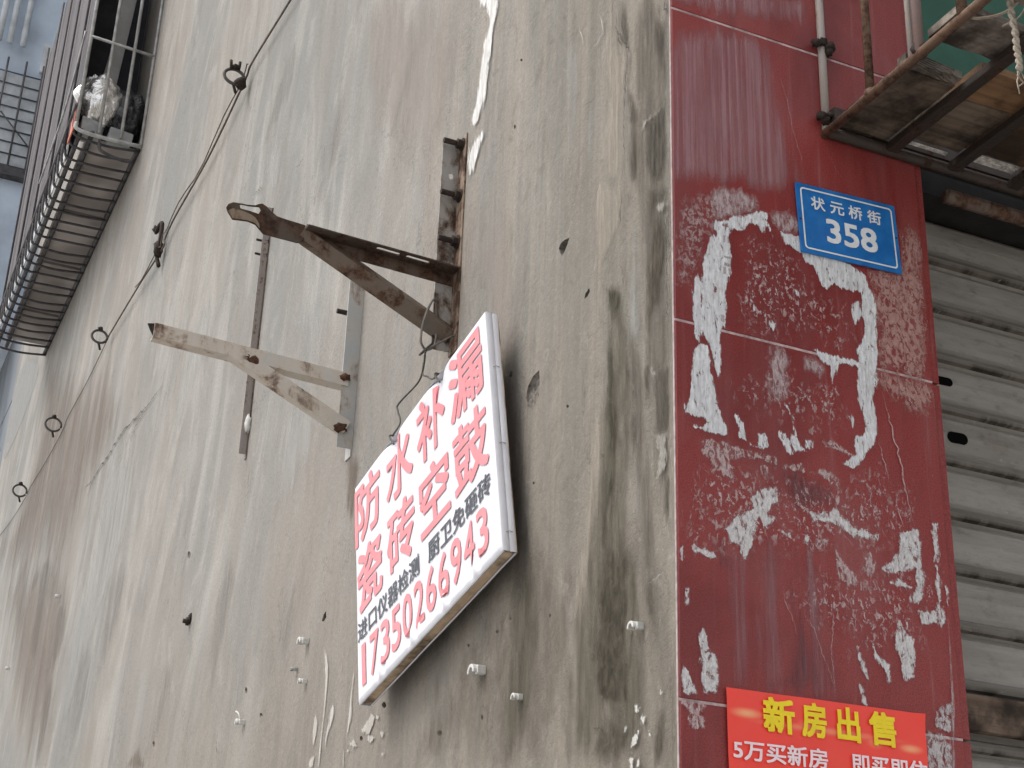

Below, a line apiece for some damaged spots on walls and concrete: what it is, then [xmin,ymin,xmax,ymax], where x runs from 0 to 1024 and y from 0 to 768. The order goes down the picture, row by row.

water stain [607,9,634,178]
peeling [684,214,933,479]
water stain [576,337,638,755]
peeling [680,544,716,560]
peeling [726,487,791,559]
peeling [809,508,879,541]
peeling [803,523,949,706]
peeling [681,628,718,730]
peeling [347,714,383,752]